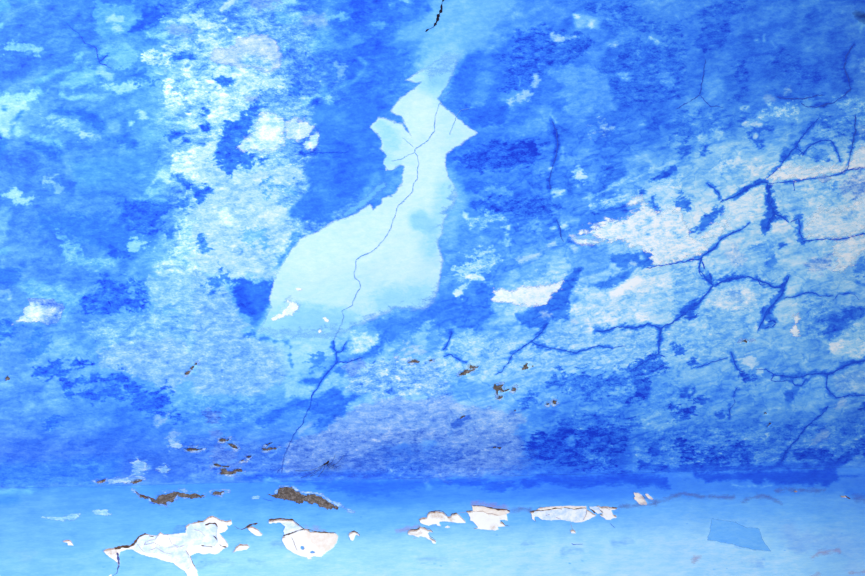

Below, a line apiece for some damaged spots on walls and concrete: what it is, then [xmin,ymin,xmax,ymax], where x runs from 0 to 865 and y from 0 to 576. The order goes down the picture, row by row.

crack [425,0,444,32]
crack [497,44,865,374]
crack [277,91,470,473]
crack [697,352,865,463]
spalling [91,475,230,506]
spalling [103,516,262,576]
spalling [269,518,338,559]
spalling [268,485,355,513]
spalling [408,505,510,544]
spalling [530,506,617,533]